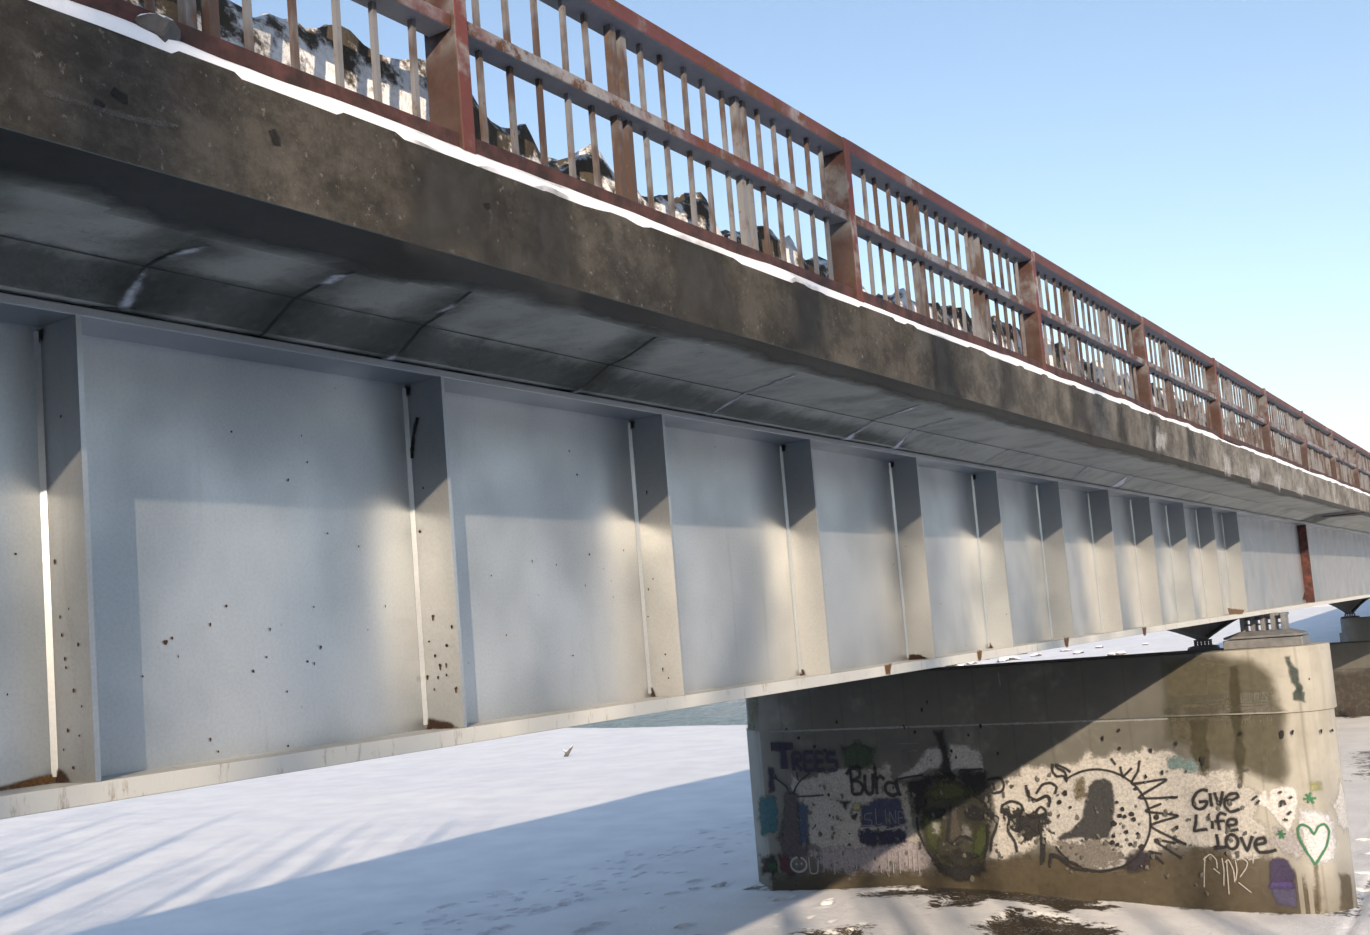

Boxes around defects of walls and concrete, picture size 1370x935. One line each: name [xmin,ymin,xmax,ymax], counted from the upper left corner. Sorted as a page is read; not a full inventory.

water stain [1286,657,1304,702]
water stain [747,657,1286,783]
water stain [772,849,1319,914]